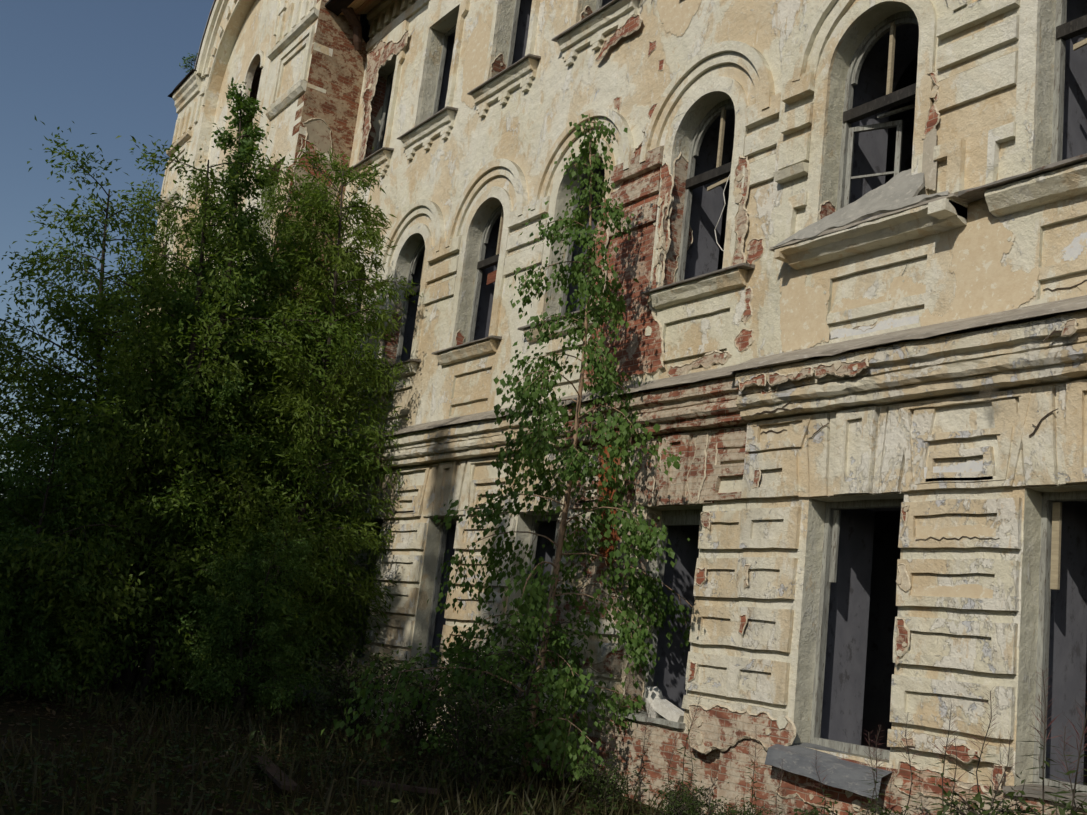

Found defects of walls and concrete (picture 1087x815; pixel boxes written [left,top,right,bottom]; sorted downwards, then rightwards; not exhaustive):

flaking render [595,14,643,62]
peeling [648,0,701,72]
flaking render [923,72,940,136]
flaking render [731,156,765,266]
flaking render [578,152,755,392]
crack [1043,279,1087,291]
flaking render [738,357,869,395]
flaking render [688,704,796,755]
flaking render [776,770,879,815]